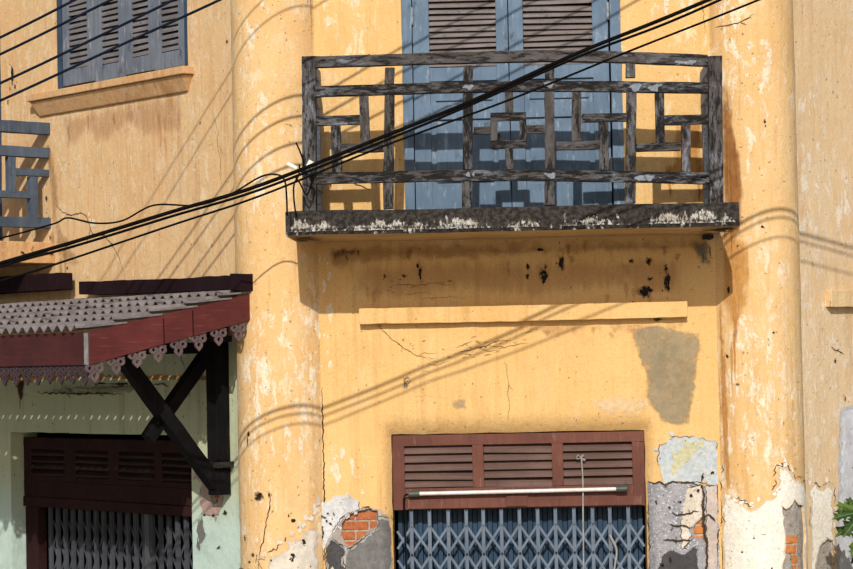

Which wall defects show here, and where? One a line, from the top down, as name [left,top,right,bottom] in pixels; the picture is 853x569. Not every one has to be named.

crack [58,207,125,277]
peeling [290,215,478,232]
peeling [562,214,619,226]
peeling [649,208,735,224]
water stain [696,244,711,262]
crack [379,325,531,412]
peeling [248,446,393,569]
peeling [654,431,837,569]